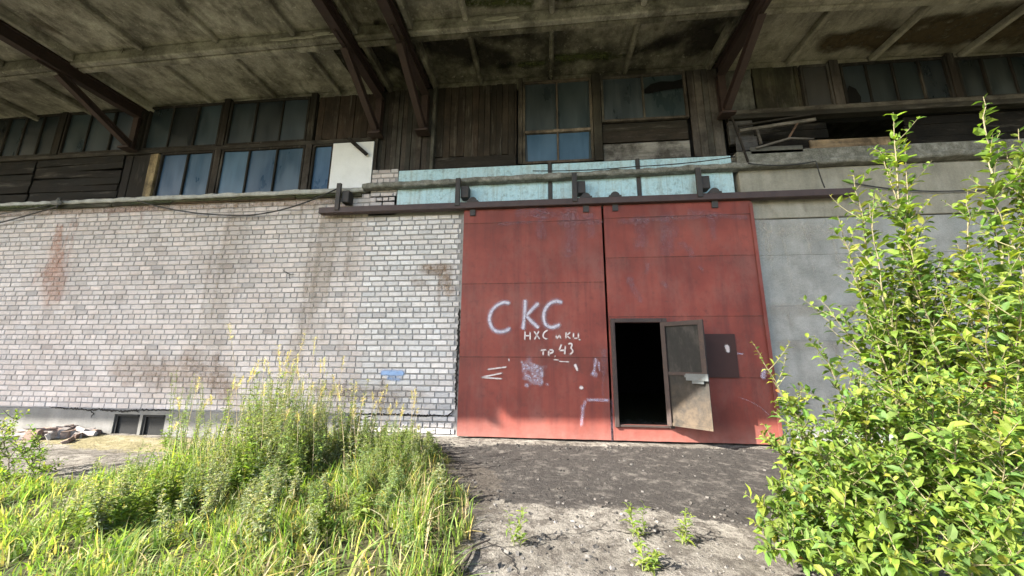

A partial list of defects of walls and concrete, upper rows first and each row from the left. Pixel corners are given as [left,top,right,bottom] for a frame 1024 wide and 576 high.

water stain [818,2,1024,53]